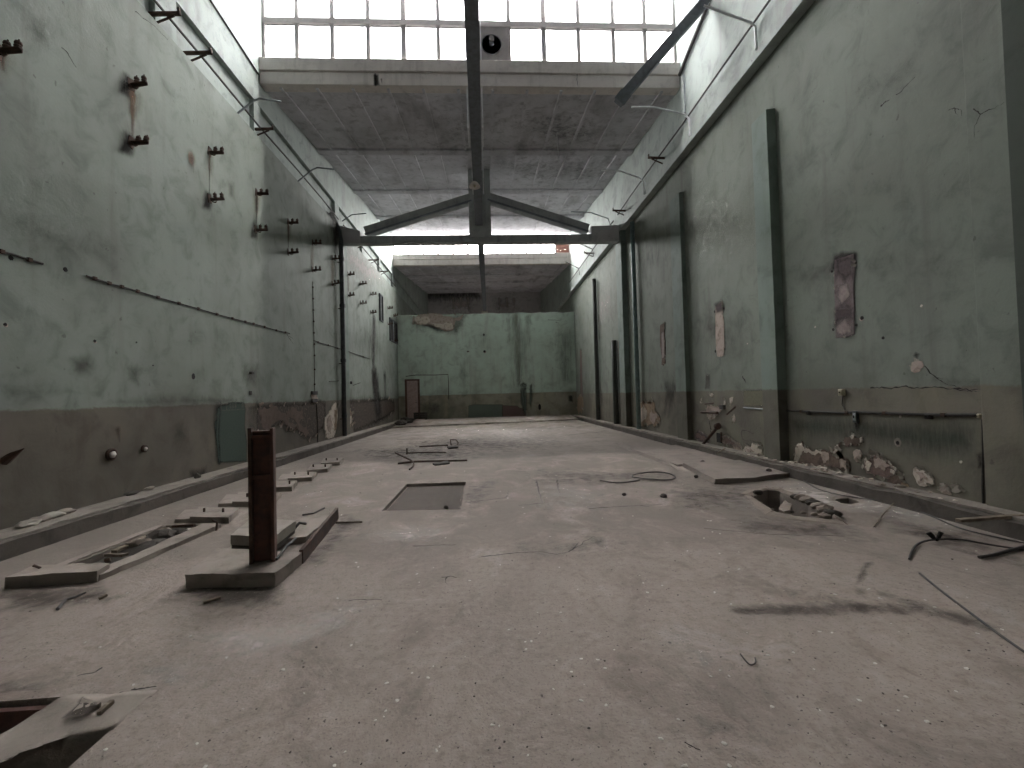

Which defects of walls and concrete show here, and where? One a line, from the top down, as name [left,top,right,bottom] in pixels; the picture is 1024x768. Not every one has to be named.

peeling [412,313,464,332]
crack [870,366,980,392]
peeling [256,395,394,442]
peeling [700,393,763,454]
peeling [793,432,952,495]